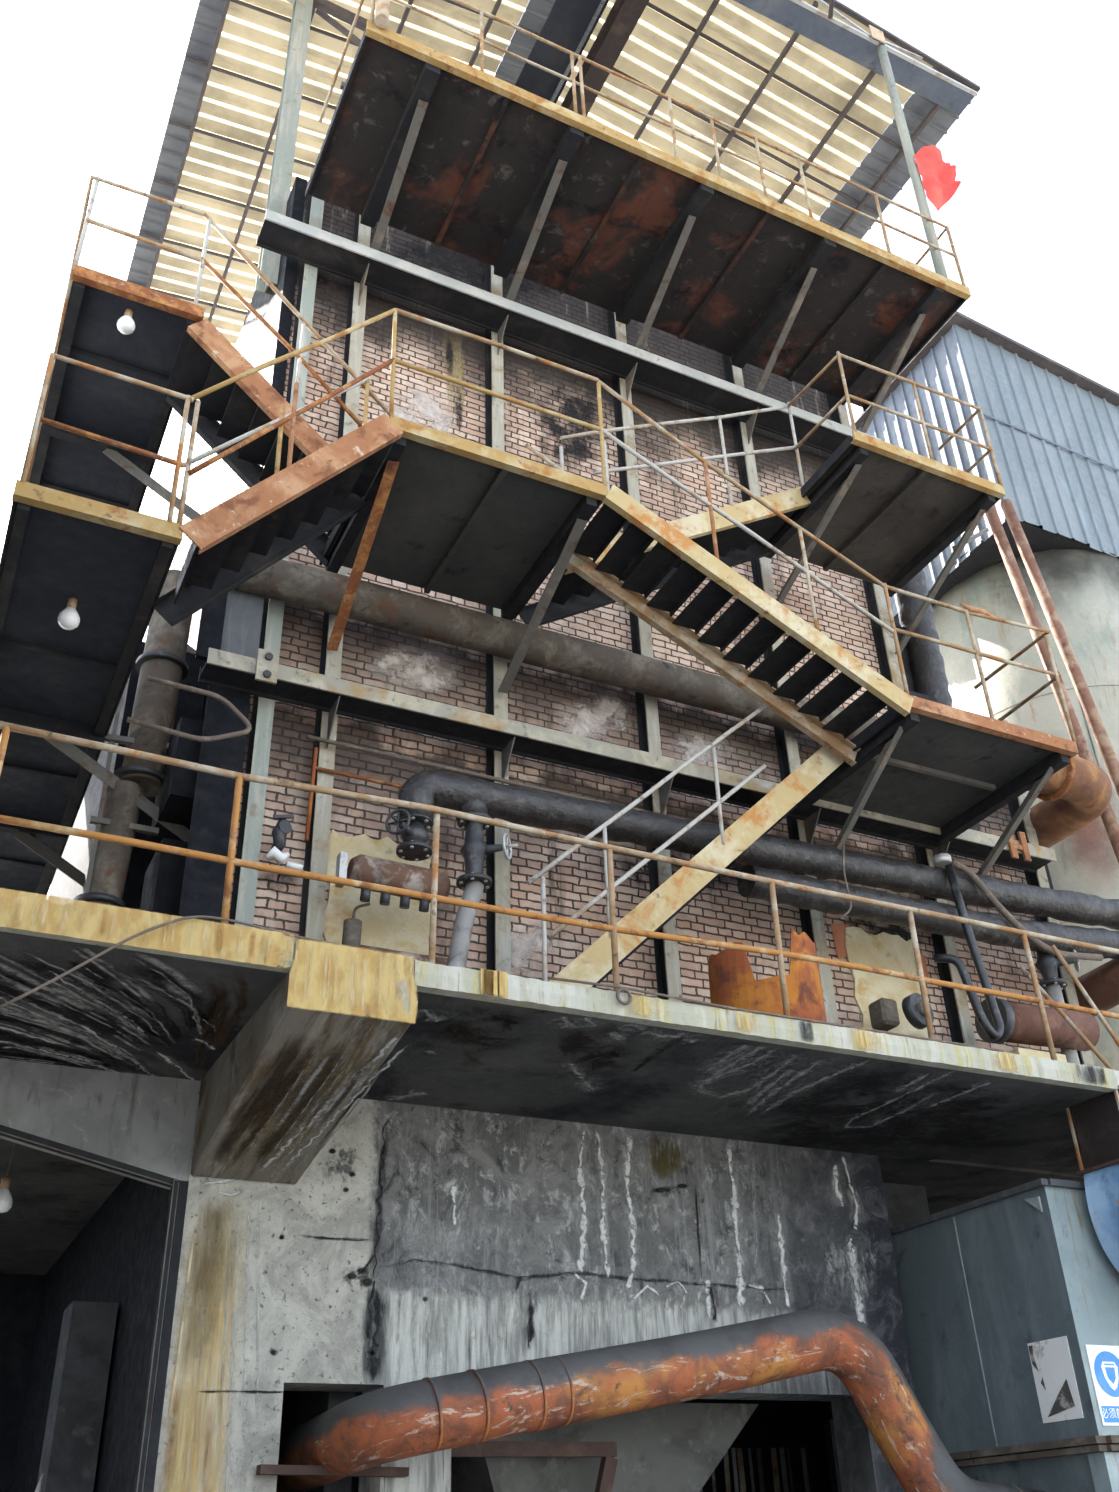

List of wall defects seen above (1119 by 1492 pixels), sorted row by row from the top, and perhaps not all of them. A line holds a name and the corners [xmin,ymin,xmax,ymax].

crack [303,1123,790,1337]